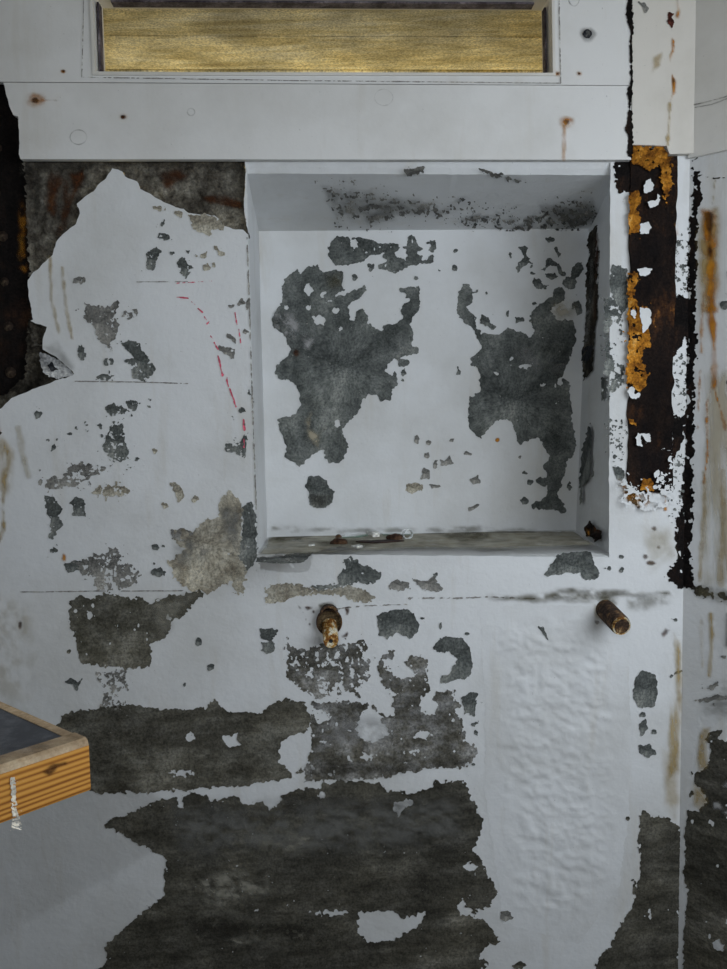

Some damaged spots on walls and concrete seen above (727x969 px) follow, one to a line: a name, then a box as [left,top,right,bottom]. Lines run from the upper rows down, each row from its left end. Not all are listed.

spalling [22,161,250,279]
rust [623,190,642,239]
rust [631,136,674,203]
spalling [0,310,74,409]
peeling [75,300,156,382]
peeling [272,178,629,514]
rust [623,271,656,392]
spalling [604,167,703,589]
rust [700,211,717,352]
peeling [38,390,514,969]
peeling [633,670,658,758]
peeling [595,730,727,969]